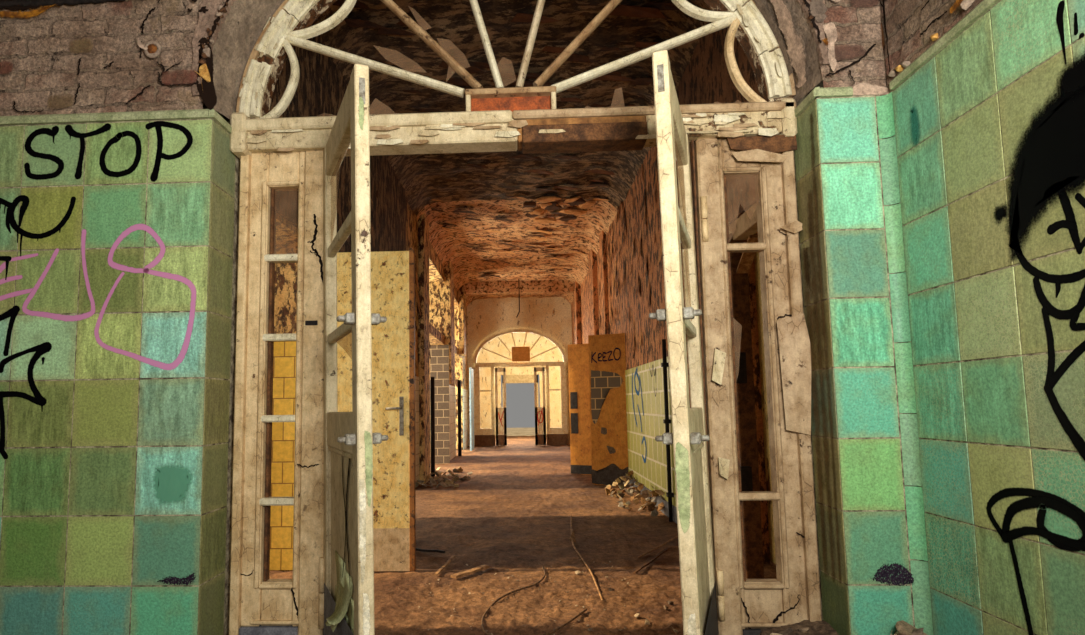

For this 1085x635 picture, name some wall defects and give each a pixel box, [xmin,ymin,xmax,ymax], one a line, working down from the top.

crack [74,57,114,104]
crack [125,0,197,104]
flaking render [187,0,229,110]
peeling [754,0,807,88]
flaking render [804,0,879,71]
crack [826,0,890,84]
crack [920,0,947,37]
flaking render [239,0,797,359]
crack [310,214,323,282]
peeling [712,349,726,385]
peeling [777,313,811,435]
peeling [325,431,373,635]